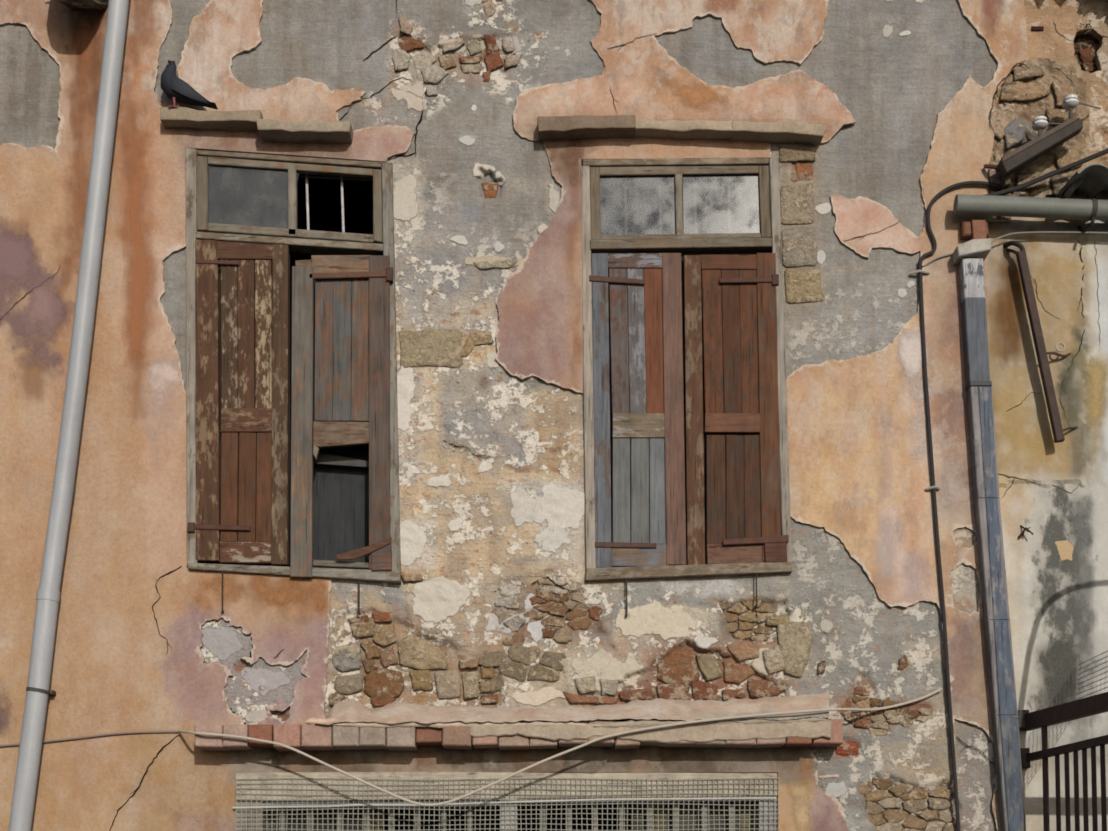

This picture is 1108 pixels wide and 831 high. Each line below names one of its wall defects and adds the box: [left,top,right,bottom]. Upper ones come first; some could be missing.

flaking render [0,24,61,149]
flaking render [155,0,210,103]
spalling [1074,20,1100,72]
leakage [0,224,67,393]
flaking render [160,248,186,391]
flaking render [231,0,997,831]
crack [152,566,181,653]
flaking render [200,618,307,725]
leakage [1033,485,1092,711]
crack [109,735,179,831]